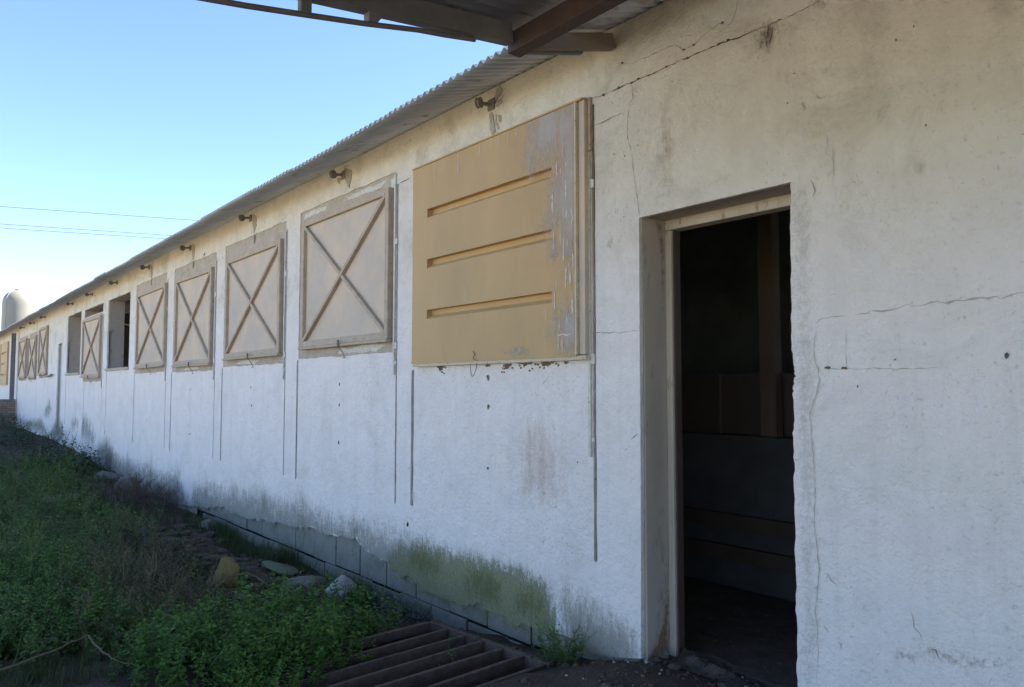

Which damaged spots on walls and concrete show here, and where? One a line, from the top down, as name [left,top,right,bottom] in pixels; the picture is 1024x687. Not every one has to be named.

crack [594,0,819,210]
peeling [485,104,574,381]
leakage [75,420,435,576]
crack [809,292,1024,678]
leakage [563,599,634,661]